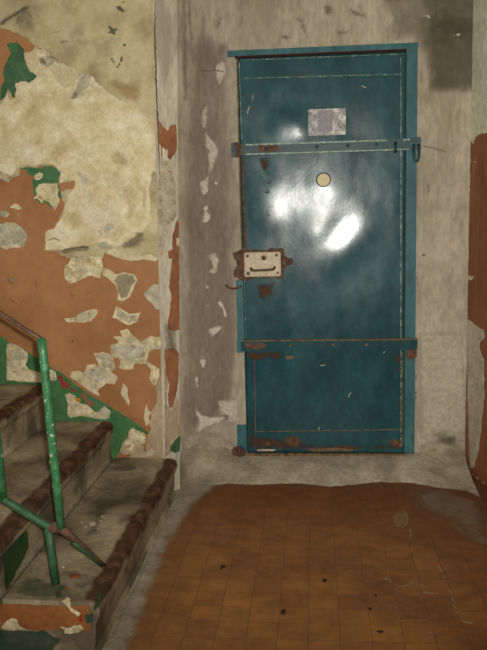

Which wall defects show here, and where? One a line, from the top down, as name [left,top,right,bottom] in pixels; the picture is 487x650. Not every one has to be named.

peeling [0,0,180,458]
rust [242,248,289,298]
rust [250,436,325,448]
peeling [1,618,25,631]
peeling [61,586,103,634]